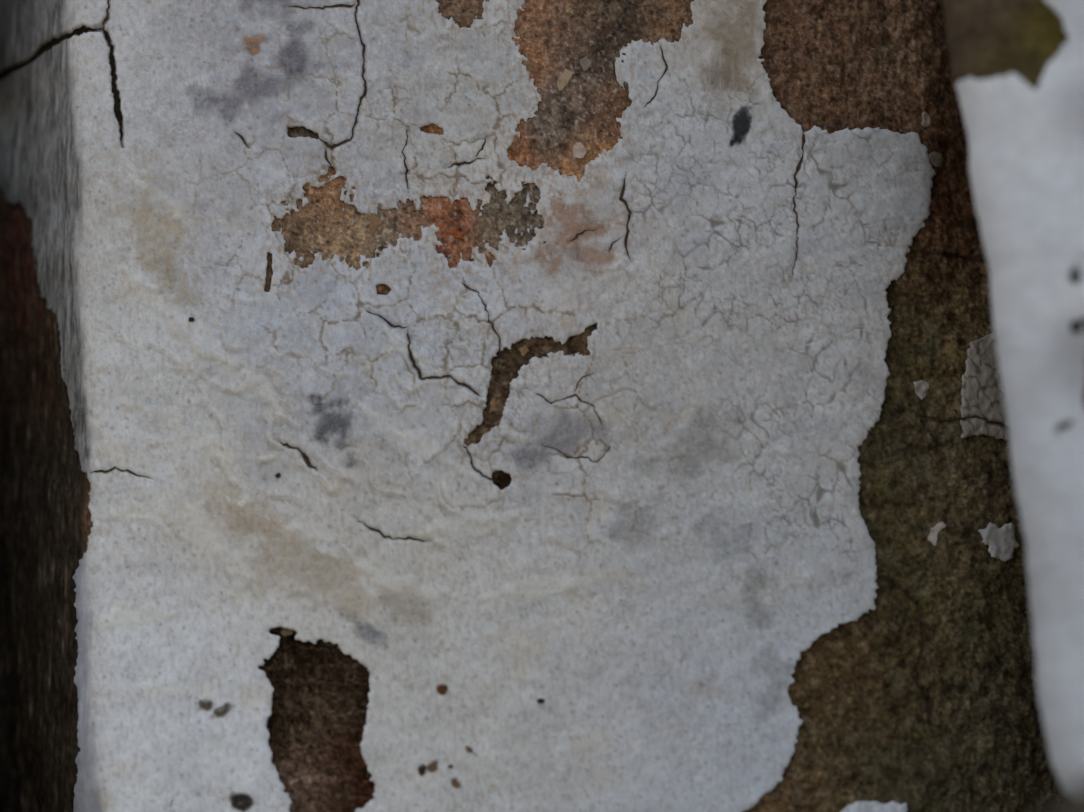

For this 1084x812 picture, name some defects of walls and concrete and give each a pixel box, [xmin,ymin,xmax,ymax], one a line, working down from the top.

crack [0,0,123,147]
peeling [264,252,273,292]
crack [288,0,367,169]
peeling [271,0,695,270]
crack [569,171,631,260]
crack [792,130,805,275]
crack [276,440,318,471]
crack [365,309,481,397]
spalling [492,471,512,490]
spalling [463,324,597,448]
peeling [744,0,1069,812]
peeling [258,627,375,812]